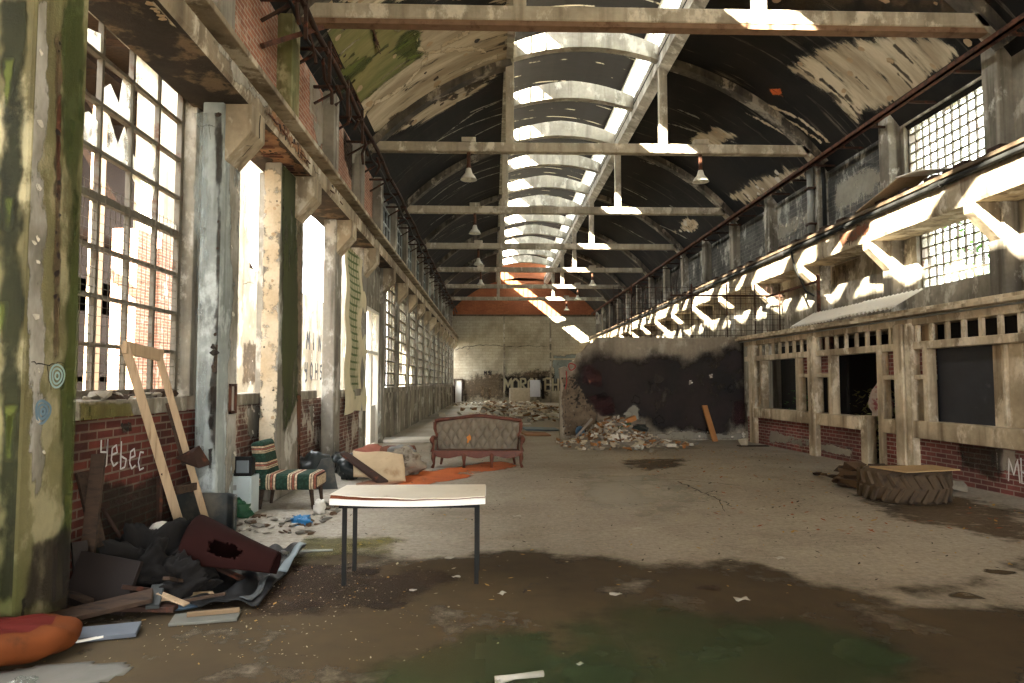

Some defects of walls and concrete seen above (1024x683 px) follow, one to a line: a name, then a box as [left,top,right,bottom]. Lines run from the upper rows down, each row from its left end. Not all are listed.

leakage [4,60,13,103]
leakage [341,31,498,117]
peeling [788,37,972,124]
peeling [690,126,737,145]
peeling [730,166,805,205]
rust [839,222,870,246]
spalling [552,354,597,436]
leakage [0,550,1024,683]